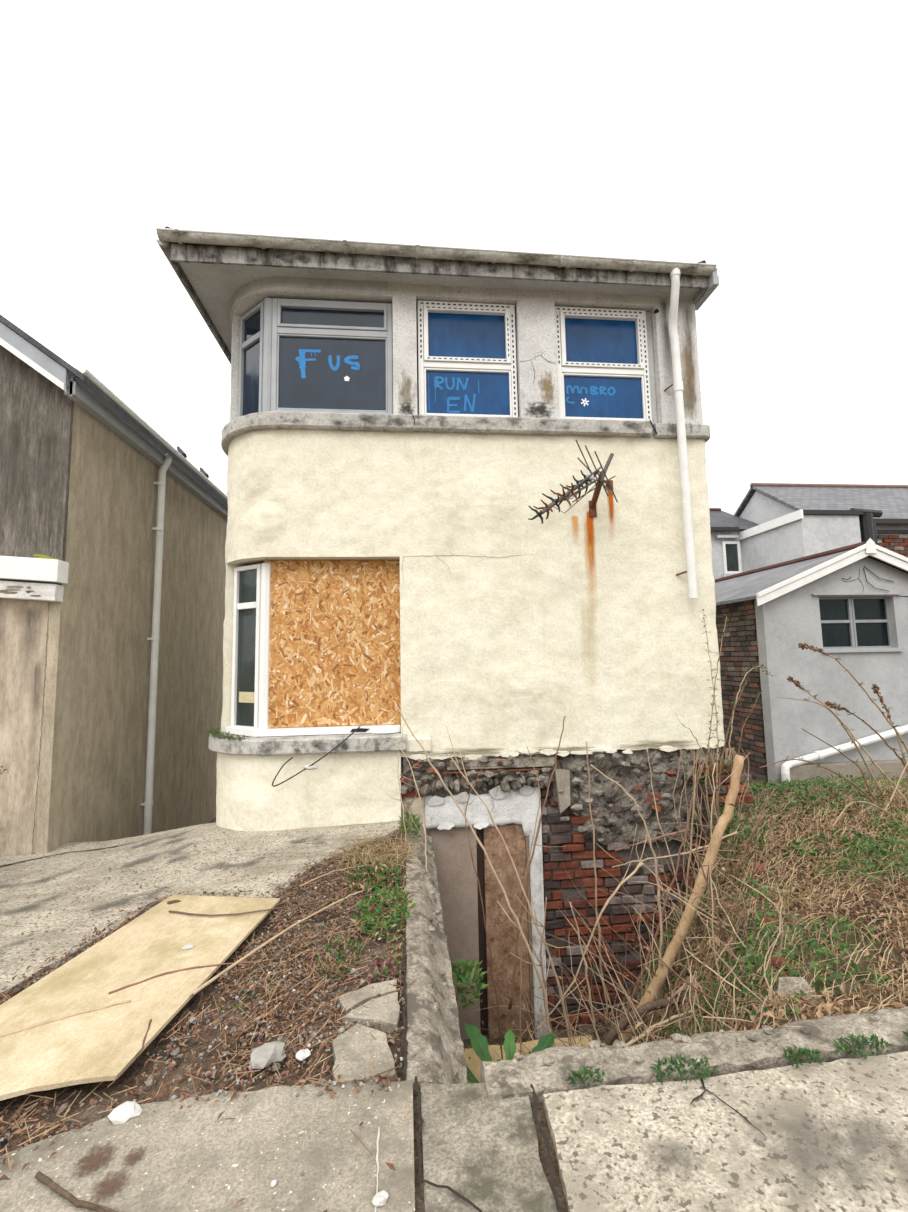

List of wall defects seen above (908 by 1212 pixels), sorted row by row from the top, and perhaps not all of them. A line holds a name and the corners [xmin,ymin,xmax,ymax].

leakage [387,378,413,425]
leakage [513,376,553,423]
corrosion [573,512,594,564]
spalling [400,745,724,945]